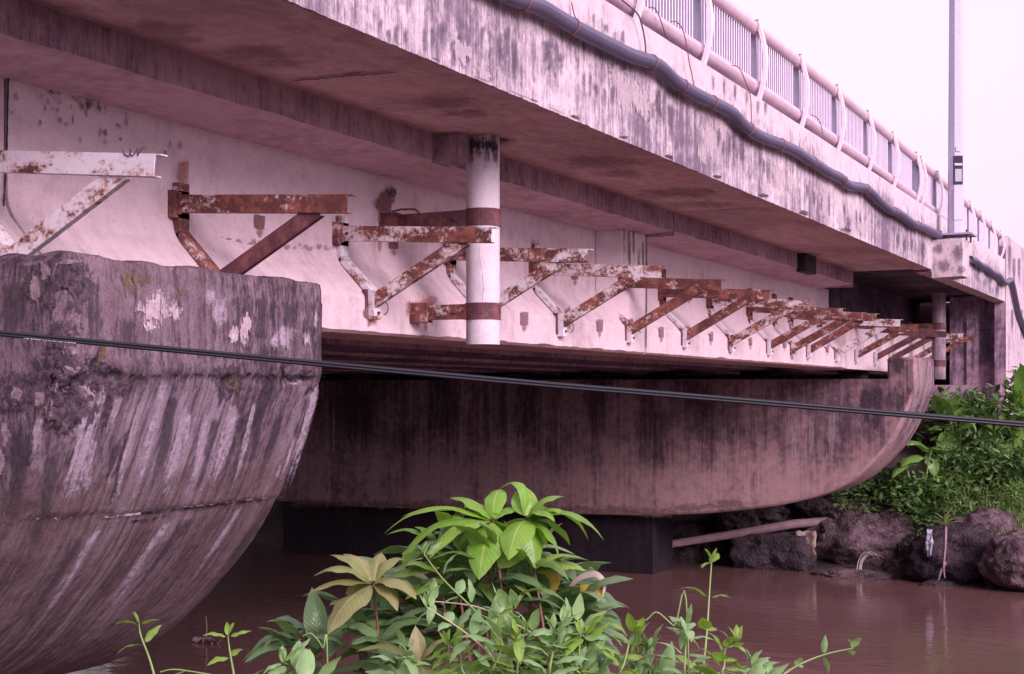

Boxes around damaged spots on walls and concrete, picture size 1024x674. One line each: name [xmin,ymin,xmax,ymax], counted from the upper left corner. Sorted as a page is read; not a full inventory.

leakage [481,27,517,67]
leakage [543,40,564,79]
leakage [469,135,514,161]
rust [254,214,265,237]
rust [374,185,397,223]
peeling [135,289,183,332]
rust [521,312,529,331]
spalling [0,259,130,475]
leakage [139,385,318,493]
leakage [32,388,122,536]
leakage [23,530,100,629]
leakage [113,520,191,602]